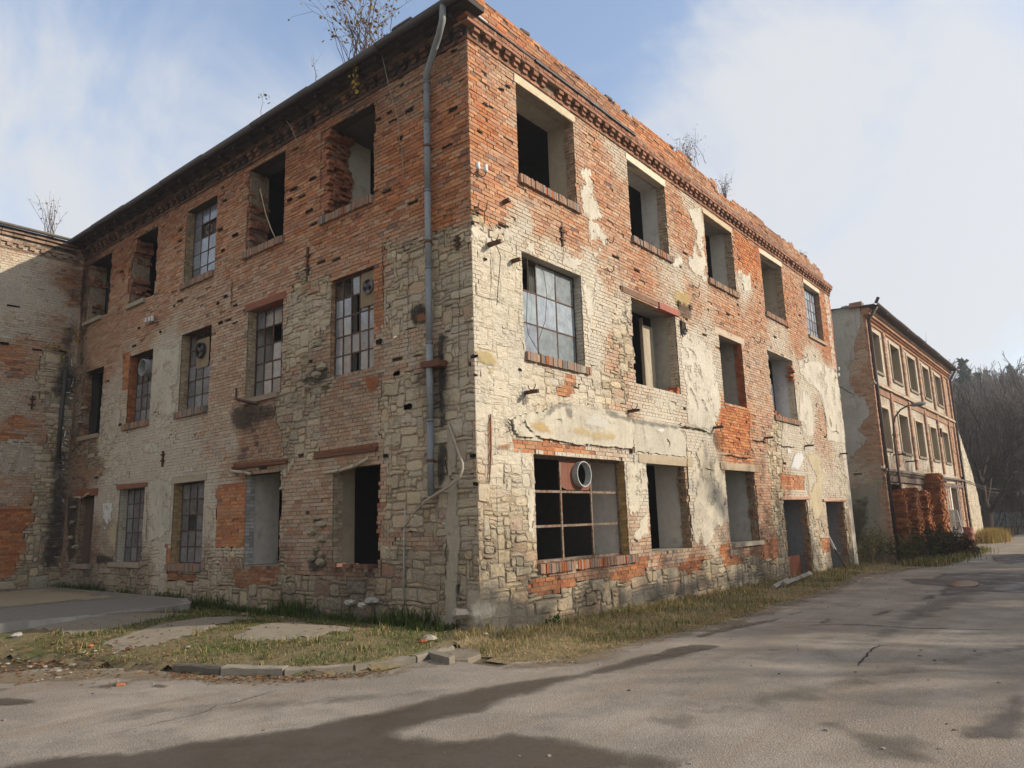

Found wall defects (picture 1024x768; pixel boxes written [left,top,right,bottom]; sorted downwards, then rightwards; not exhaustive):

peeling [588,219,609,257]
hole [677,317,688,339]
leakage [231,406,273,429]
peeling [799,391,814,437]
spalling [512,439,595,455]
leakage [42,457,77,566]